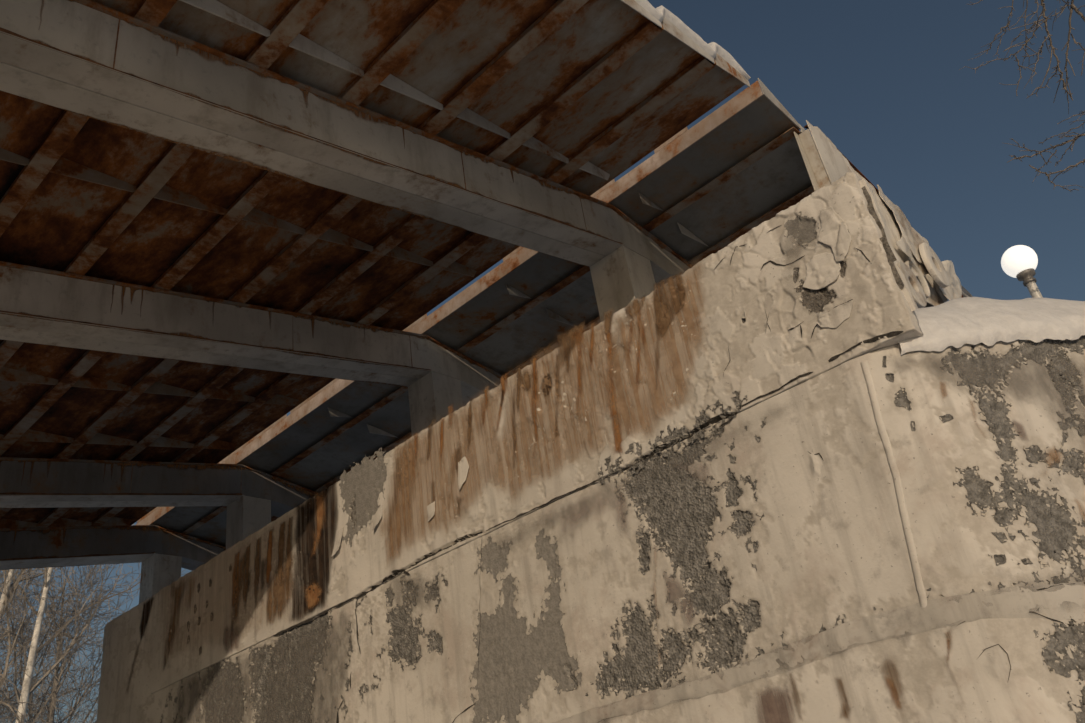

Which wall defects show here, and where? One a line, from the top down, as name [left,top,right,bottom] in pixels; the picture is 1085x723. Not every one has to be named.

rust [0,0,701,558]
crack [761,256,804,269]
peeling [784,207,872,315]
crack [861,186,904,289]
rust [85,482,337,650]
peeling [331,447,388,557]
spalling [376,573,448,672]
crack [273,299,903,723]
spalling [469,391,788,723]
spalling [941,335,1085,592]
crack [1023,582,1085,632]
spalling [1033,616,1085,723]